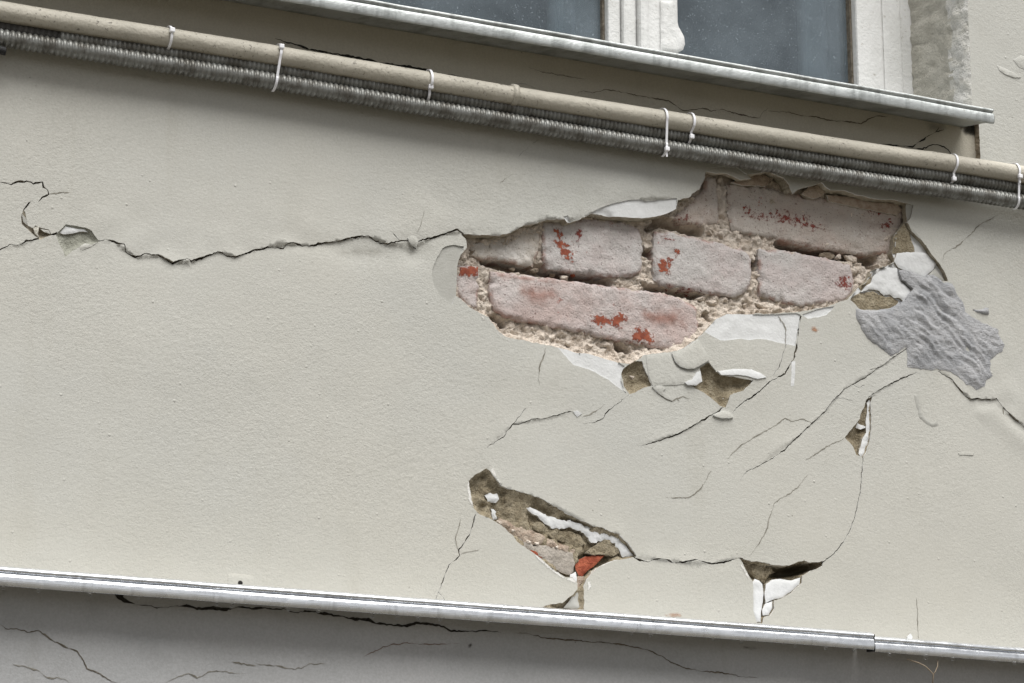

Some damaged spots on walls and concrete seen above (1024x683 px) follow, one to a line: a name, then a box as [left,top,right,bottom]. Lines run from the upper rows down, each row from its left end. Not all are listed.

crack [1,180,70,210]
crack [0,232,57,250]
crack [99,214,465,264]
flaking render [432,167,948,419]
crack [646,316,802,445]
crack [490,396,627,445]
crack [633,349,1024,564]
flaking render [845,396,872,458]
flaking render [467,468,636,610]
crack [141,514,757,680]
flaking render [740,559,823,624]
crack [3,626,116,683]